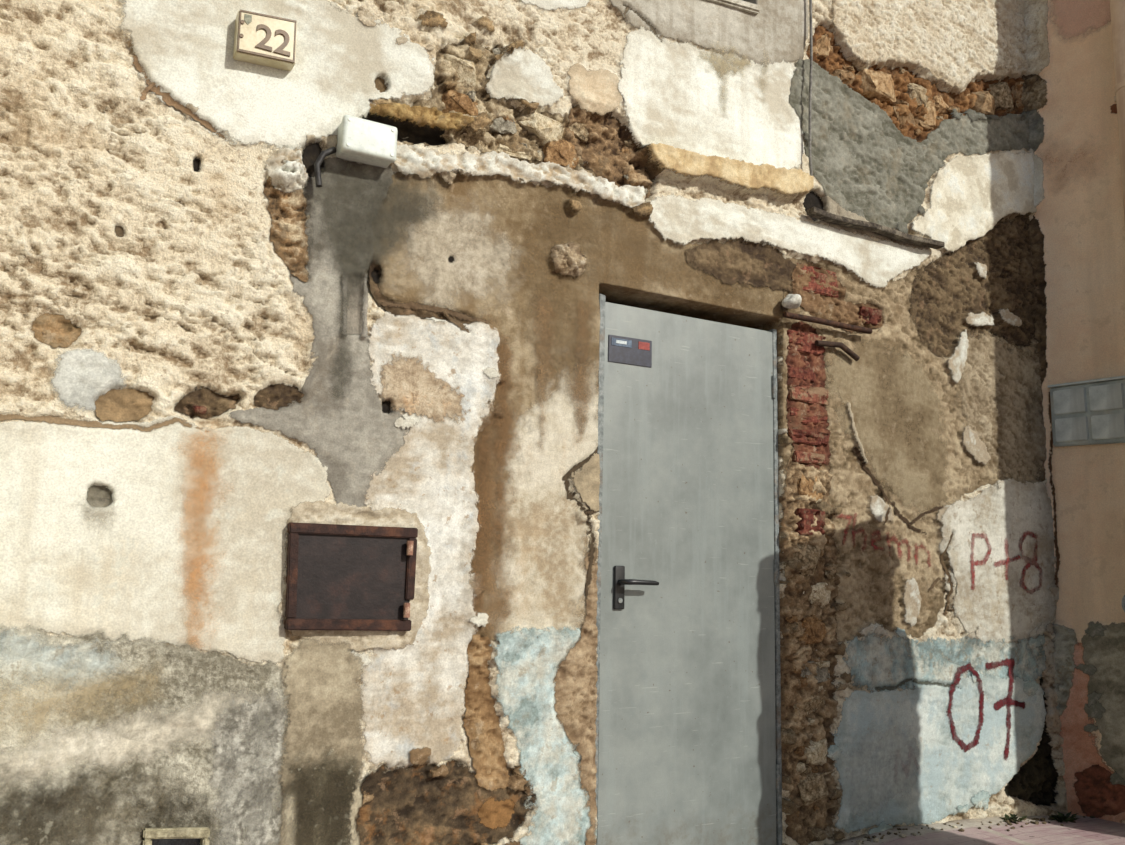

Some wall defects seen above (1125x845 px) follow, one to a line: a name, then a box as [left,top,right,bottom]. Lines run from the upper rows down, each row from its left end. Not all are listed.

damp [308,161,511,396]
damp [524,192,744,433]
crack [0,414,208,432]
damp [473,339,514,630]
spalling [355,10,1125,845]
crack [847,402,954,616]
damp [0,626,365,845]
peeling [351,650,372,668]
crack [875,679,961,691]